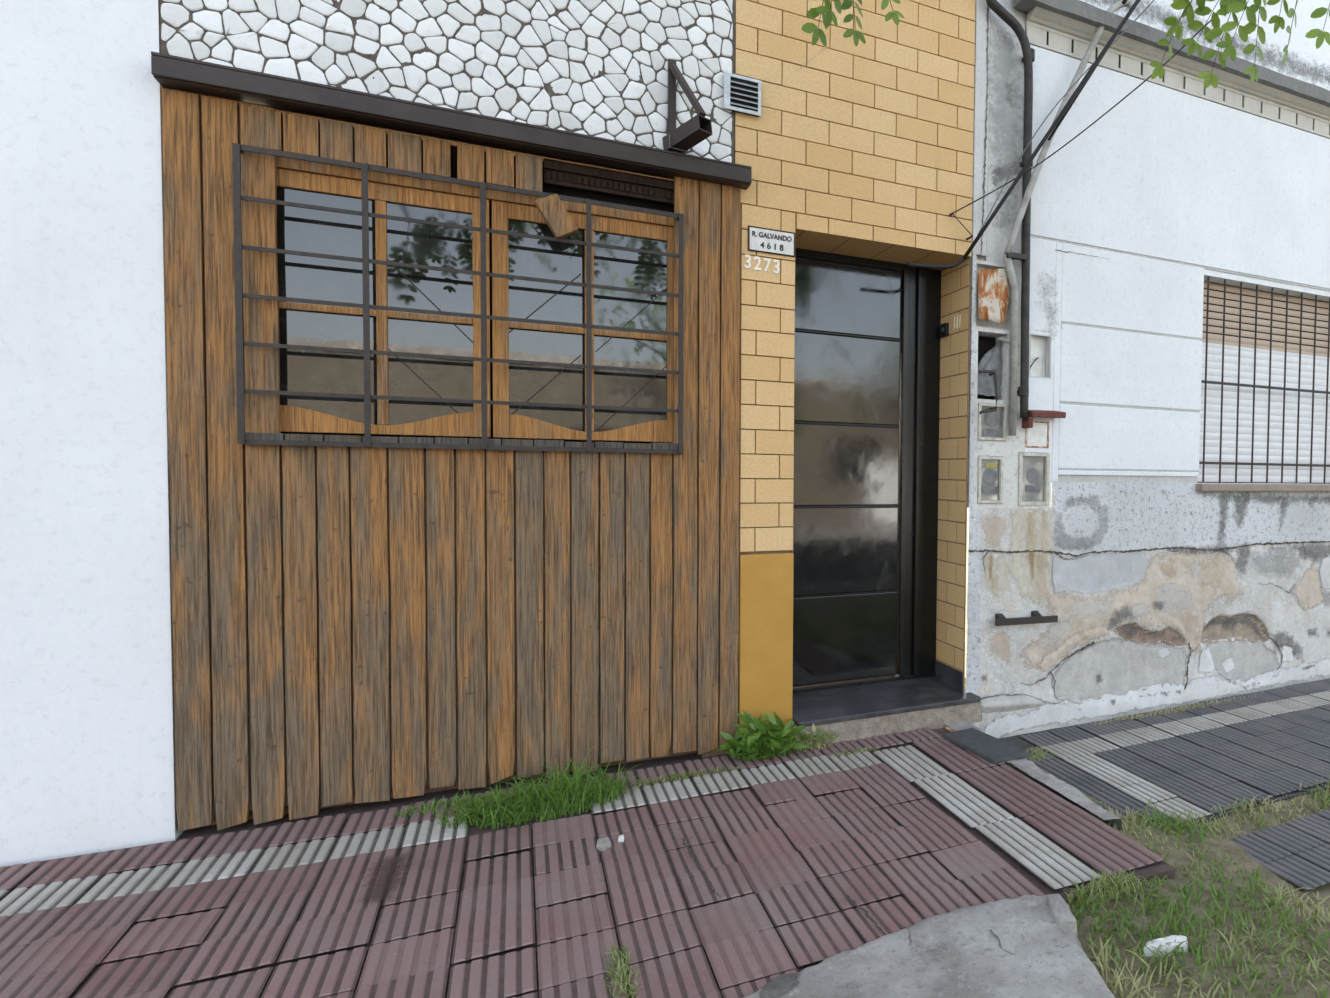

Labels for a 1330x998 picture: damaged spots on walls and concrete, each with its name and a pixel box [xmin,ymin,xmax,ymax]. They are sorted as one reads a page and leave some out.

damp [1055,497,1107,548]
crack [968,541,1330,593]
damp [1174,492,1330,574]
peeling [983,550,1330,738]